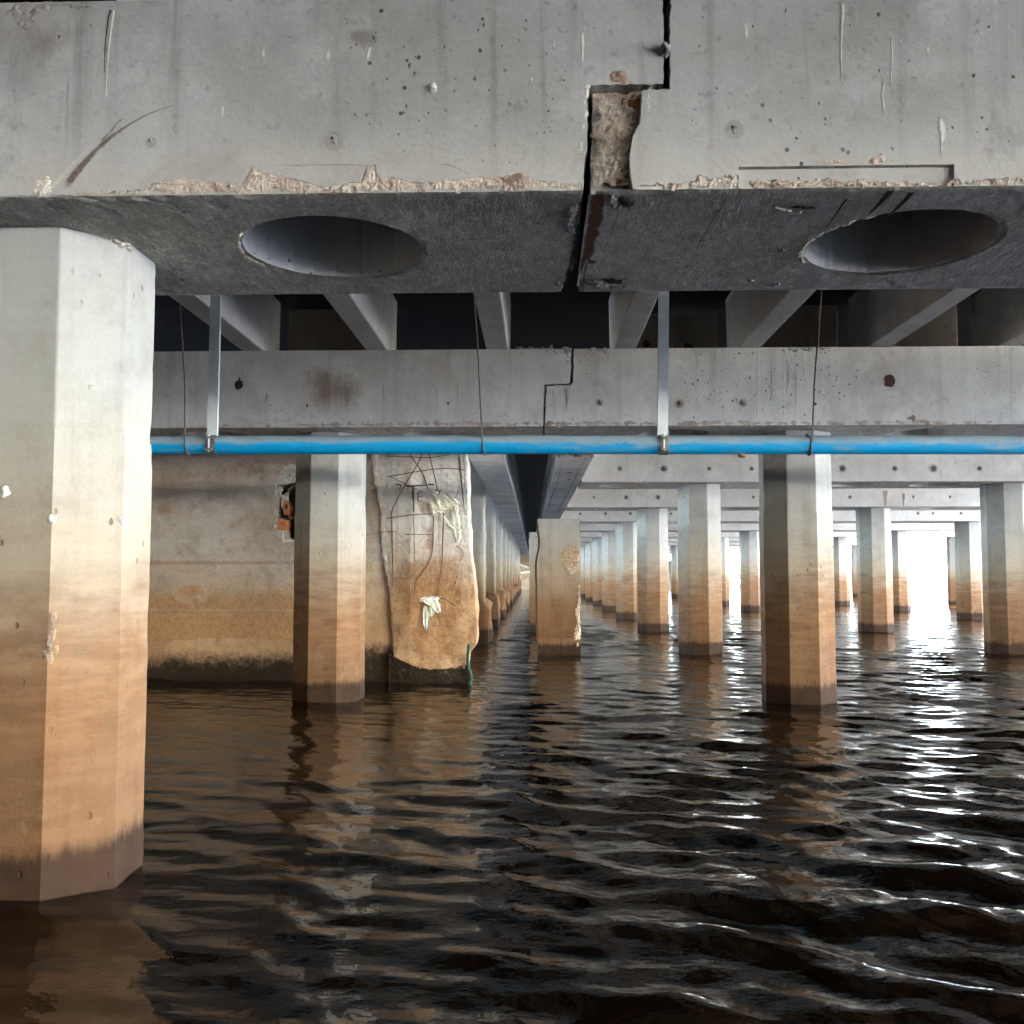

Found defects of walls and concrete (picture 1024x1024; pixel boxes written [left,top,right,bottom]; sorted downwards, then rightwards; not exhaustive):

spalling [33,176,52,198]
crack [36,104,177,197]
spalling [70,71,1024,210]
rust [577,194,607,286]
spalling [273,463,296,543]
spalling [367,454,469,626]
spalling [561,543,581,647]
water stain [0,428,377,902]